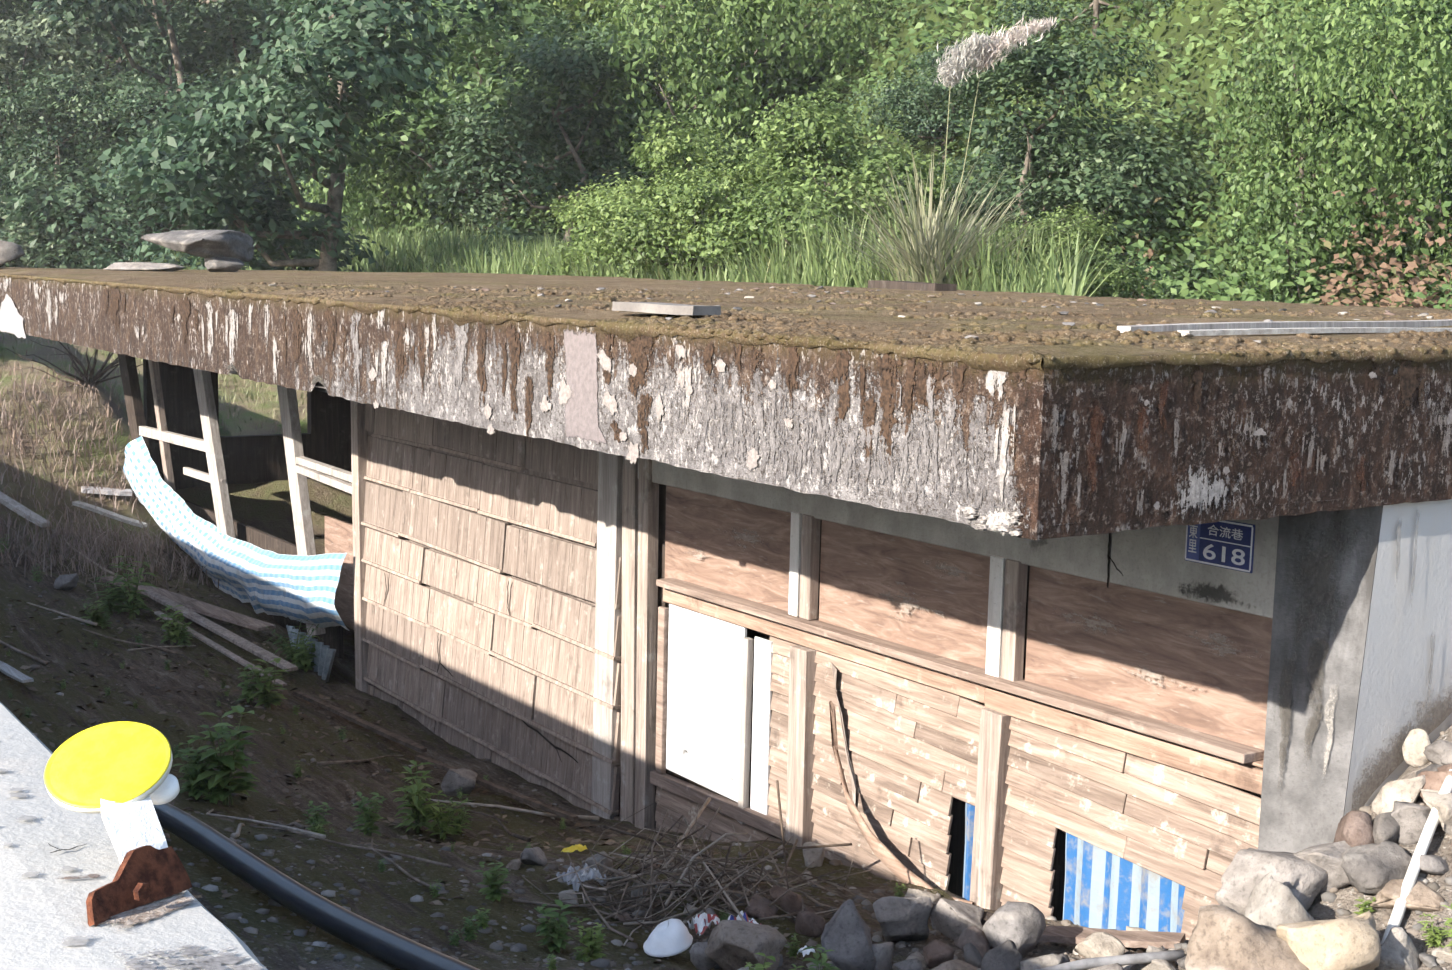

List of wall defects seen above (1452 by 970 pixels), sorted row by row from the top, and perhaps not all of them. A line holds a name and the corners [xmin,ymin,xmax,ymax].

spalling [0,294,26,338]
water stain [1179,583,1250,606]
water stain [1279,523,1359,777]